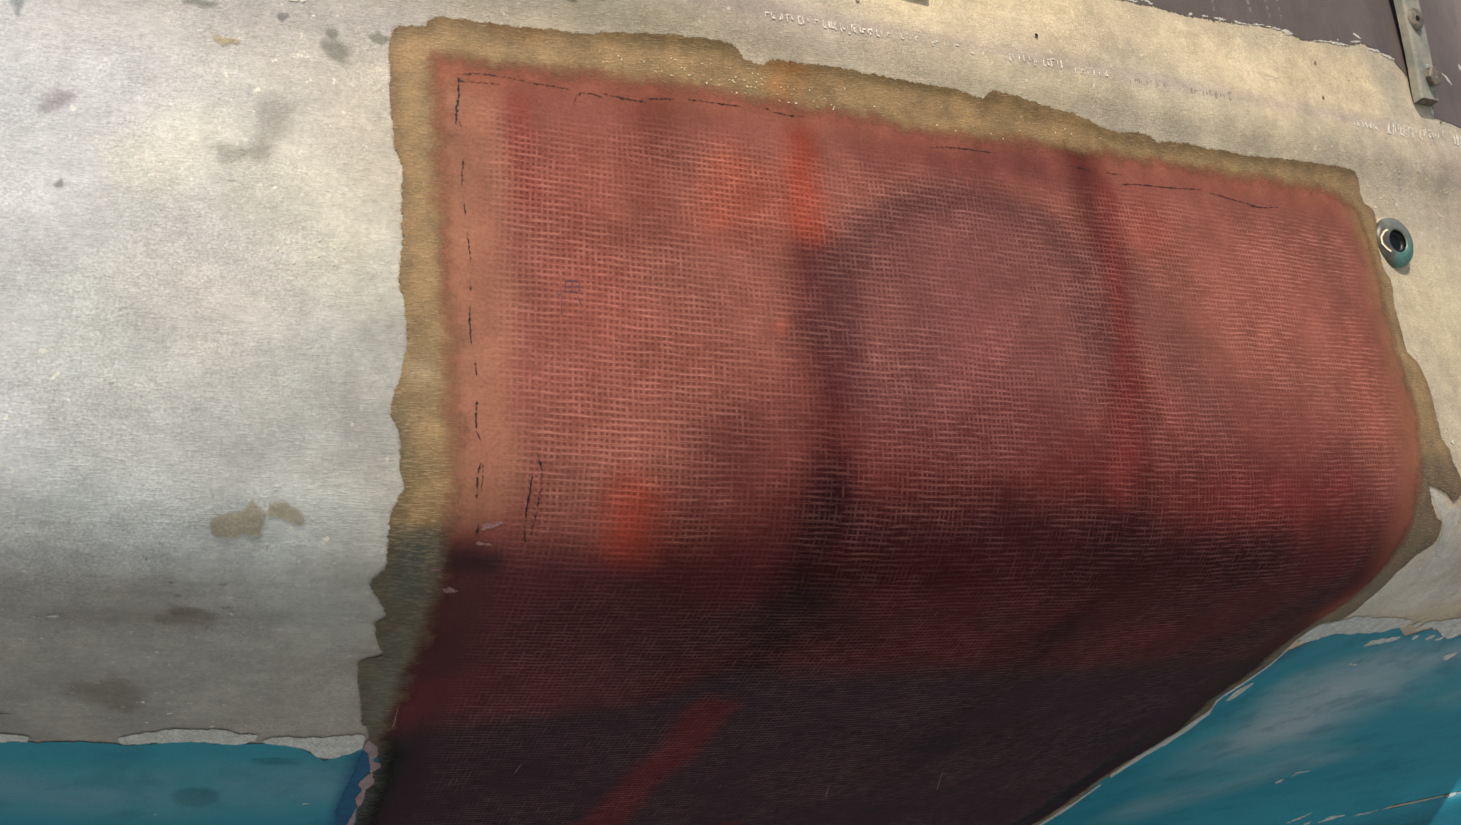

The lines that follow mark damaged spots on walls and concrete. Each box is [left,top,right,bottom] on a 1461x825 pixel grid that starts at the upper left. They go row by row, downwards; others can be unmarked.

peeling [765,11,984,55]
peeling [1009,53,1109,76]
peeling [1189,12,1293,35]
peeling [1315,33,1394,60]
peeling [1354,107,1461,147]
damp [211,487,305,545]
peeling [0,734,29,742]
peeling [1039,616,1461,825]
peeling [118,729,381,825]